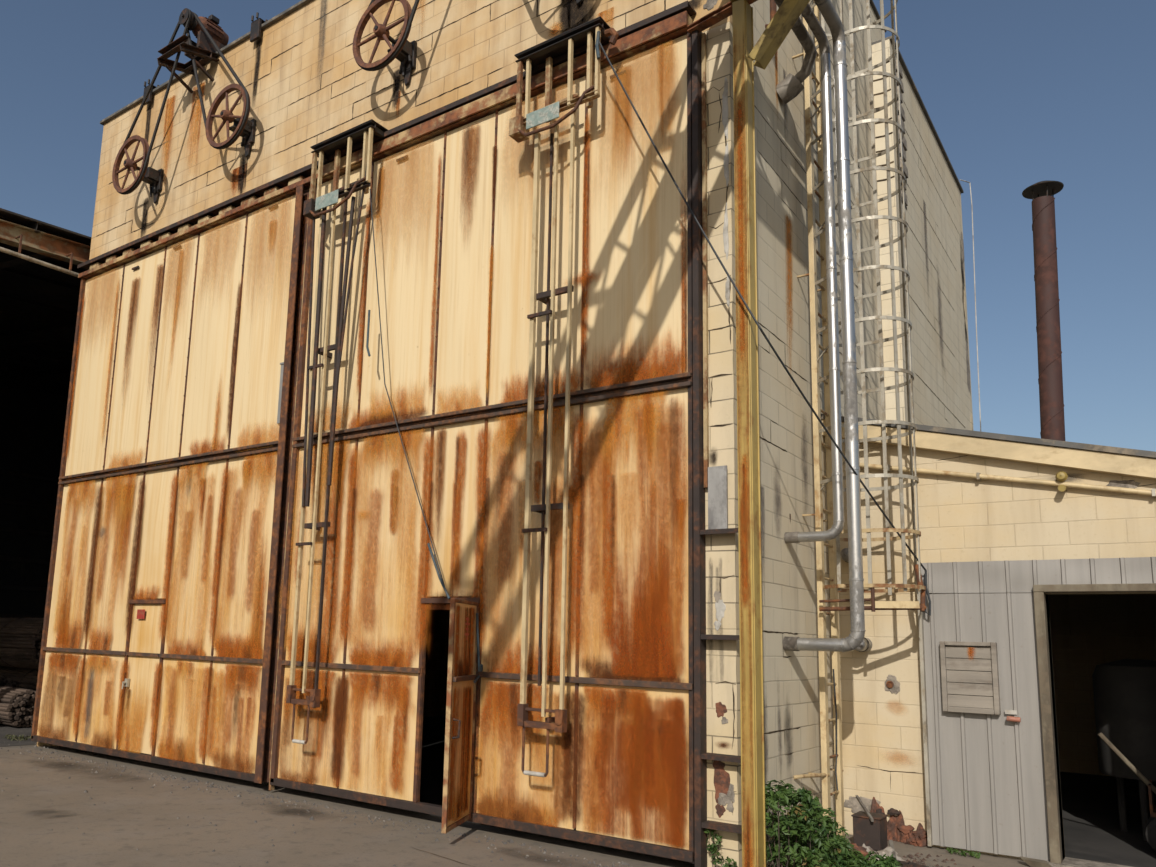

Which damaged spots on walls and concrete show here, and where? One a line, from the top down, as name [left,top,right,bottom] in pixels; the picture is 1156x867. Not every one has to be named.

corrosion [658,43,670,132]
corrosion [38,278,264,774]
corrosion [240,431,279,479]
corrosion [278,117,687,848]
spalling [715,702,728,724]
spalling [712,760,735,818]